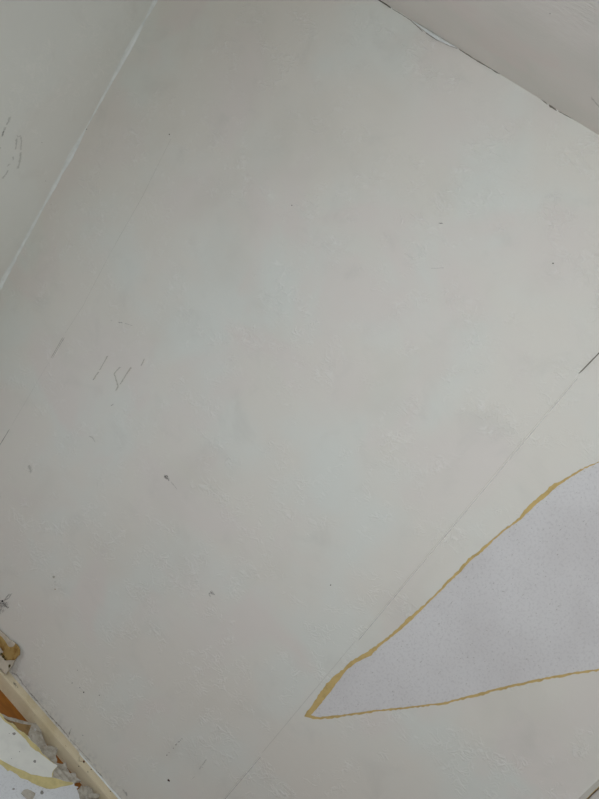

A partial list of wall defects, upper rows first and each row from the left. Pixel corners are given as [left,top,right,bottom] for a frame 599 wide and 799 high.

crack [379,0,498,73]
peeling [305,462,599,720]